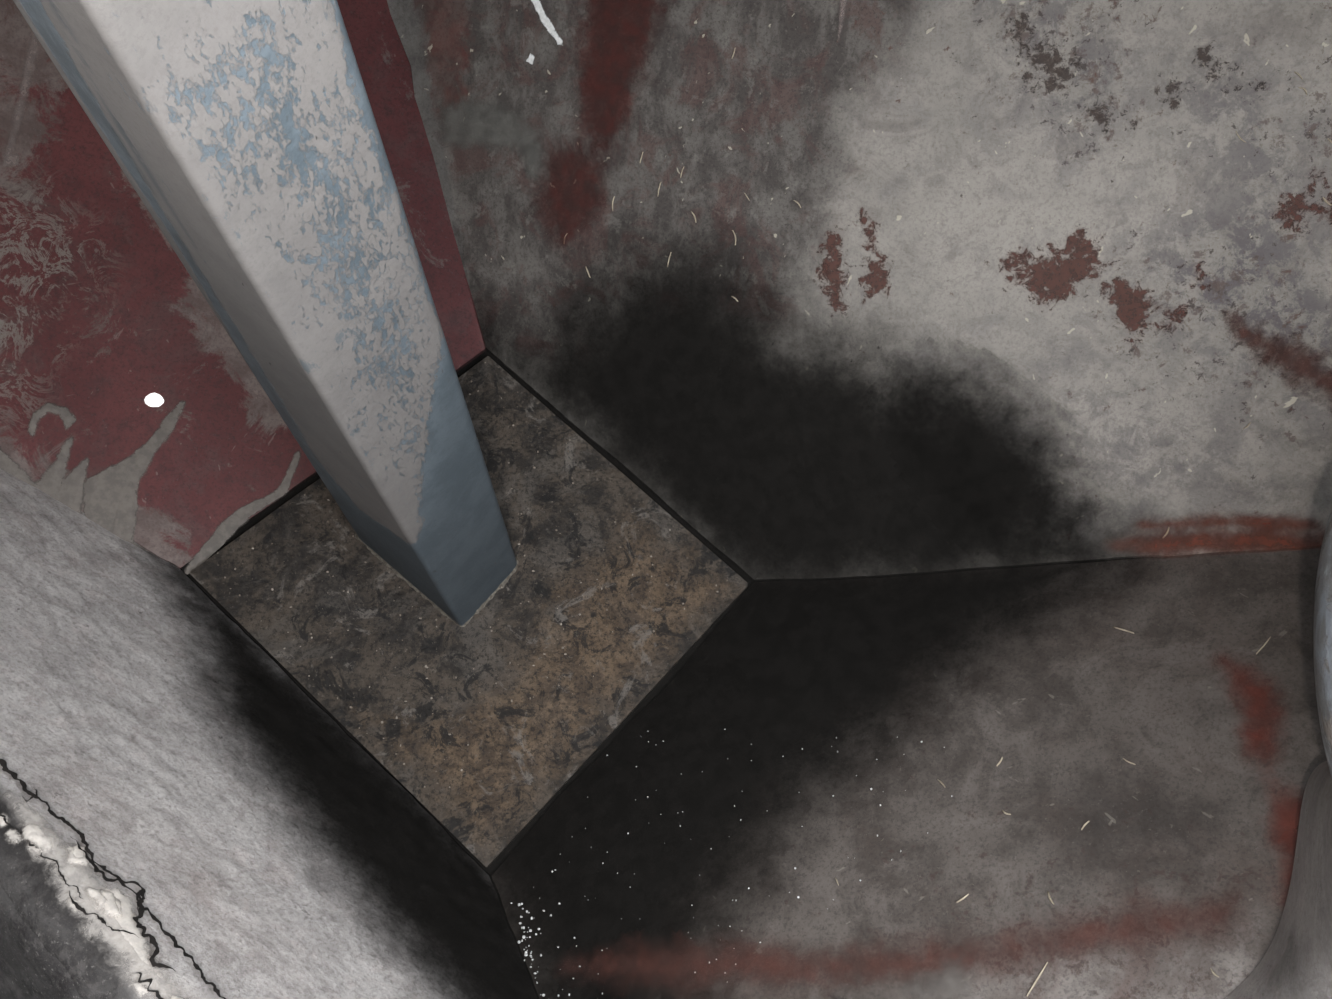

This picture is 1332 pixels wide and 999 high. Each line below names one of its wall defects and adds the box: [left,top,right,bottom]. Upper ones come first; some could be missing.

corrosion [1230,314,1332,401]
leakage [164,251,1133,999]
corrosion [1122,515,1322,555]
crack [0,759,226,999]